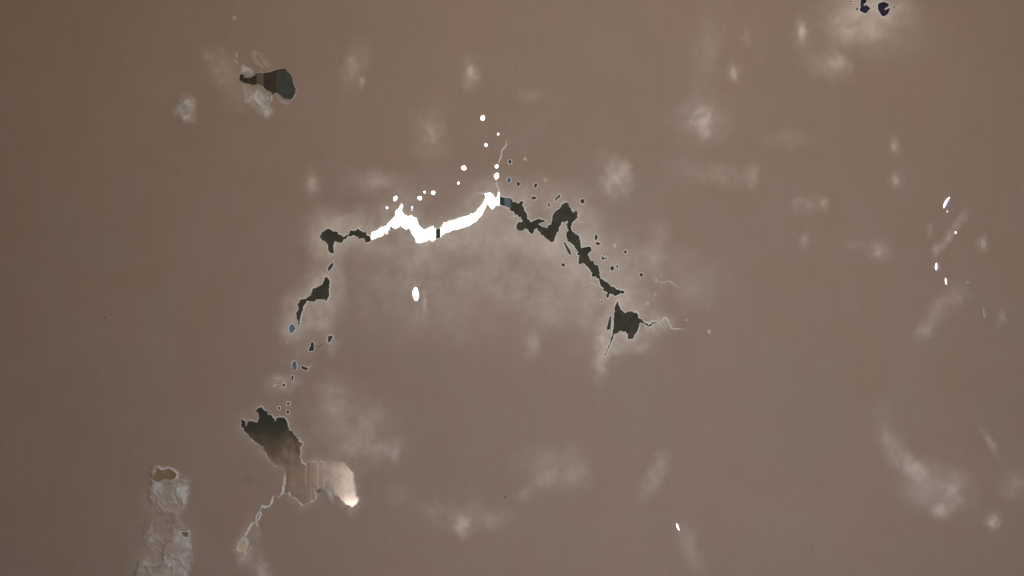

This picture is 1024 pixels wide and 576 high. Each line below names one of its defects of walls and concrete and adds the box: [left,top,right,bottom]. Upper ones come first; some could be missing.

spalling [846,0,895,16]
peeling [238,49,292,121]
spalling [287,263,333,343]
water stain [227,0,826,547]
peeling [132,464,196,576]